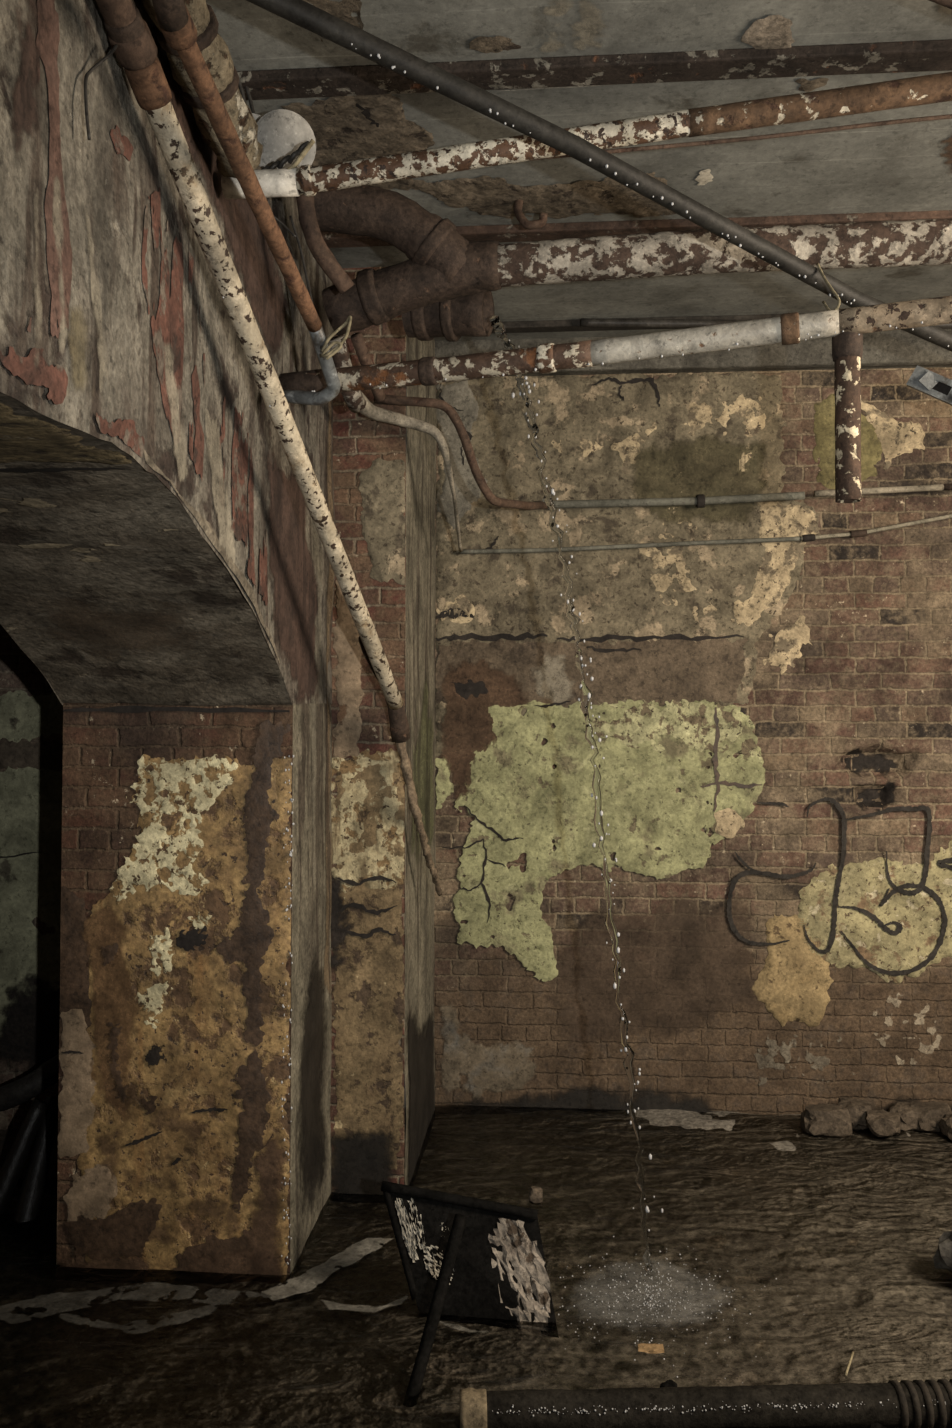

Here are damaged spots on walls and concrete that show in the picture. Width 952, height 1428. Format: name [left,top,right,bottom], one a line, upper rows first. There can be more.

spalling [303,0,364,29]
flaking render [809,394,835,489]
flaking render [861,401,925,482]
peeling [0,690,63,743]
crack [535,700,571,708]
flaking render [435,372,820,982]
spalling [841,748,898,811]
peeling [0,766,63,1036]
crack [442,805,523,923]
flaking render [751,839,952,1027]
peeling [57,754,292,1282]